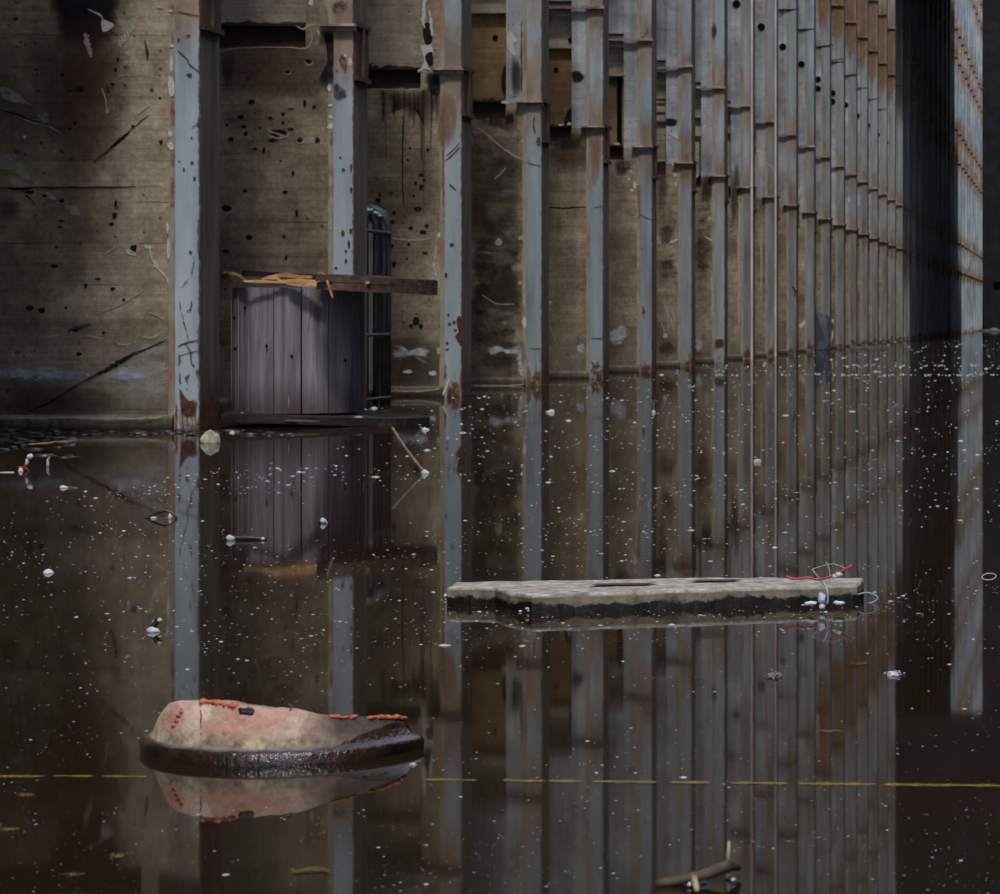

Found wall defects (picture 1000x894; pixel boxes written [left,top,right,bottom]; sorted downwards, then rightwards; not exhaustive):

peeling [369,0,434,91]
crack [24,339,199,415]
corrosion [179,370,199,416]